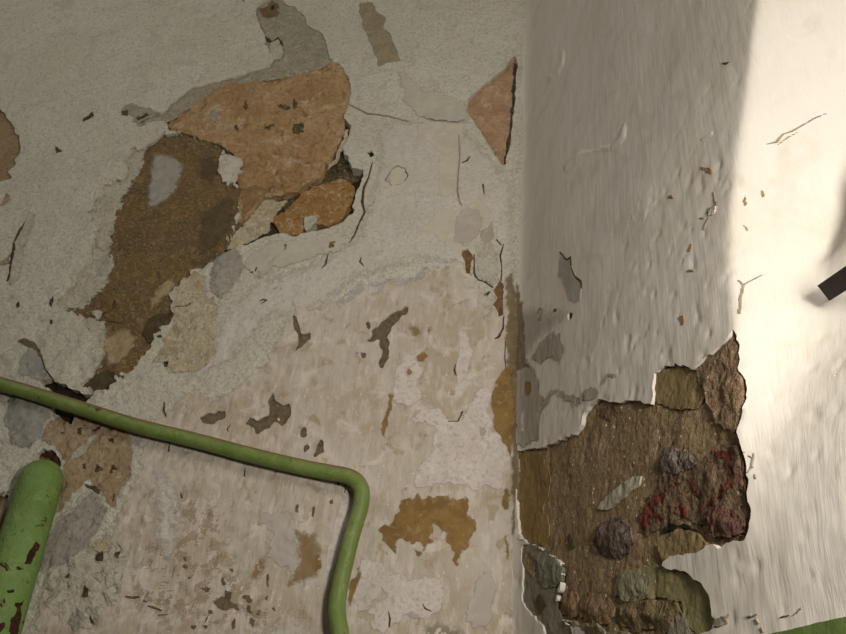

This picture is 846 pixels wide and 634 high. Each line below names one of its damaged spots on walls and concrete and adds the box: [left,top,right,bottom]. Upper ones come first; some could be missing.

spalling [0,111,21,182]
crack [348,103,408,122]
spalling [359,2,518,196]
crack [767,113,827,145]
crack [0,211,35,285]
spalling [18,0,363,402]
crack [349,162,373,266]
peeling [145,241,751,634]
peeling [4,395,354,634]